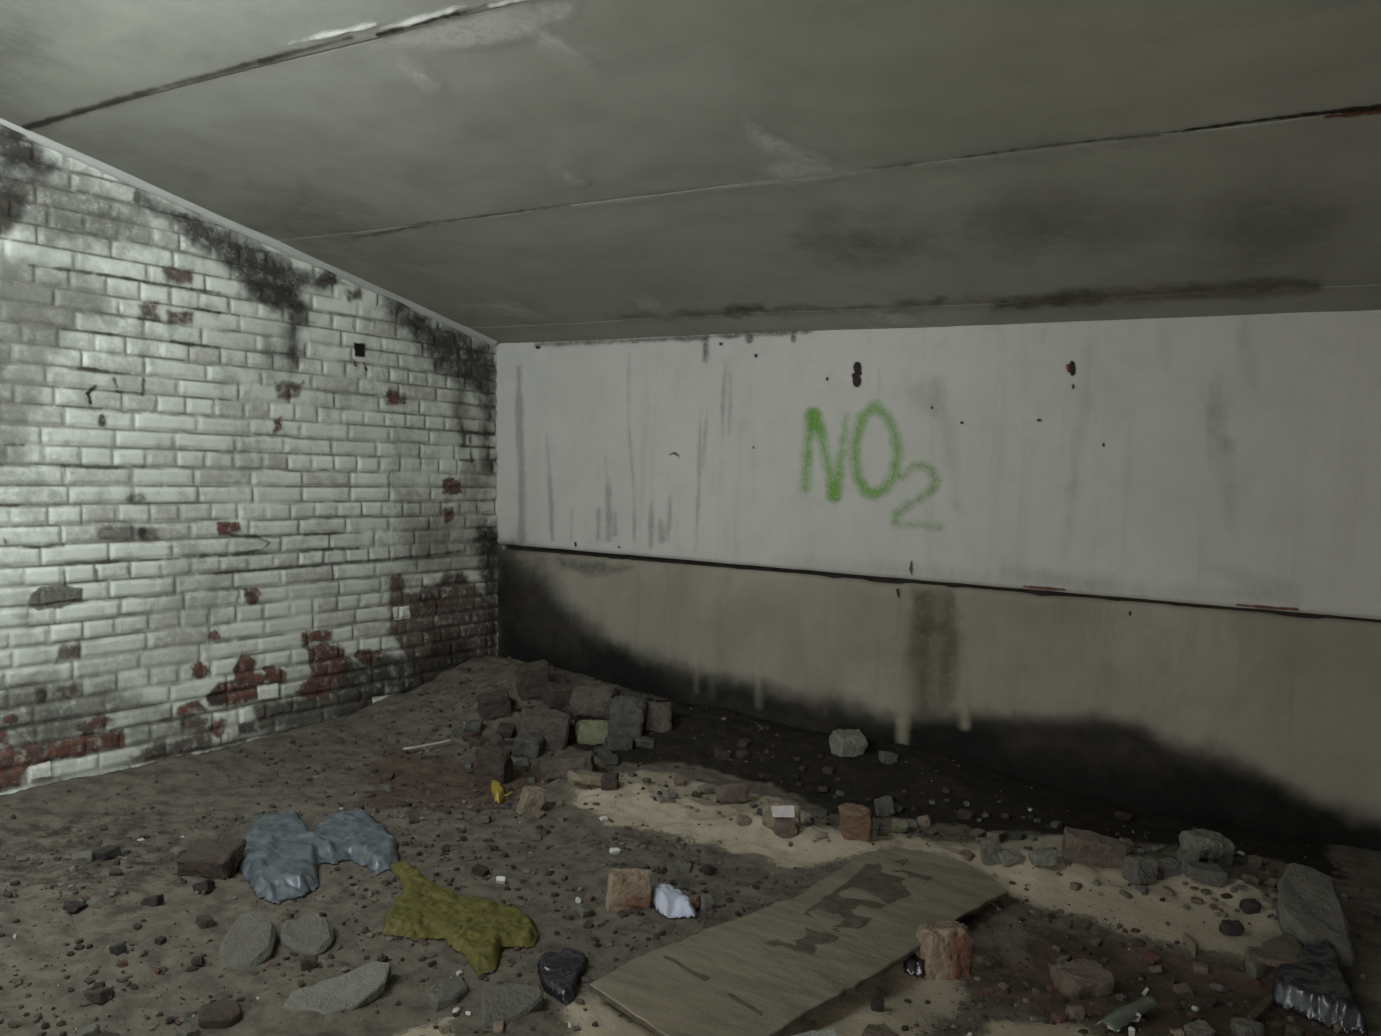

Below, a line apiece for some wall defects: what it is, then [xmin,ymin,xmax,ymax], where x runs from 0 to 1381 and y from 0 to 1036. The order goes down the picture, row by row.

crack [22,0,504,130]
water stain [0,125,135,240]
crack [966,104,1381,157]
water stain [137,193,325,361]
water stain [0,268,99,455]
water stain [391,302,497,469]
peeling [0,714,125,788]
peeling [58,643,80,658]
peeling [244,588,260,605]
peeling [138,630,381,760]
peeling [389,573,498,683]
water stain [261,525,1381,851]